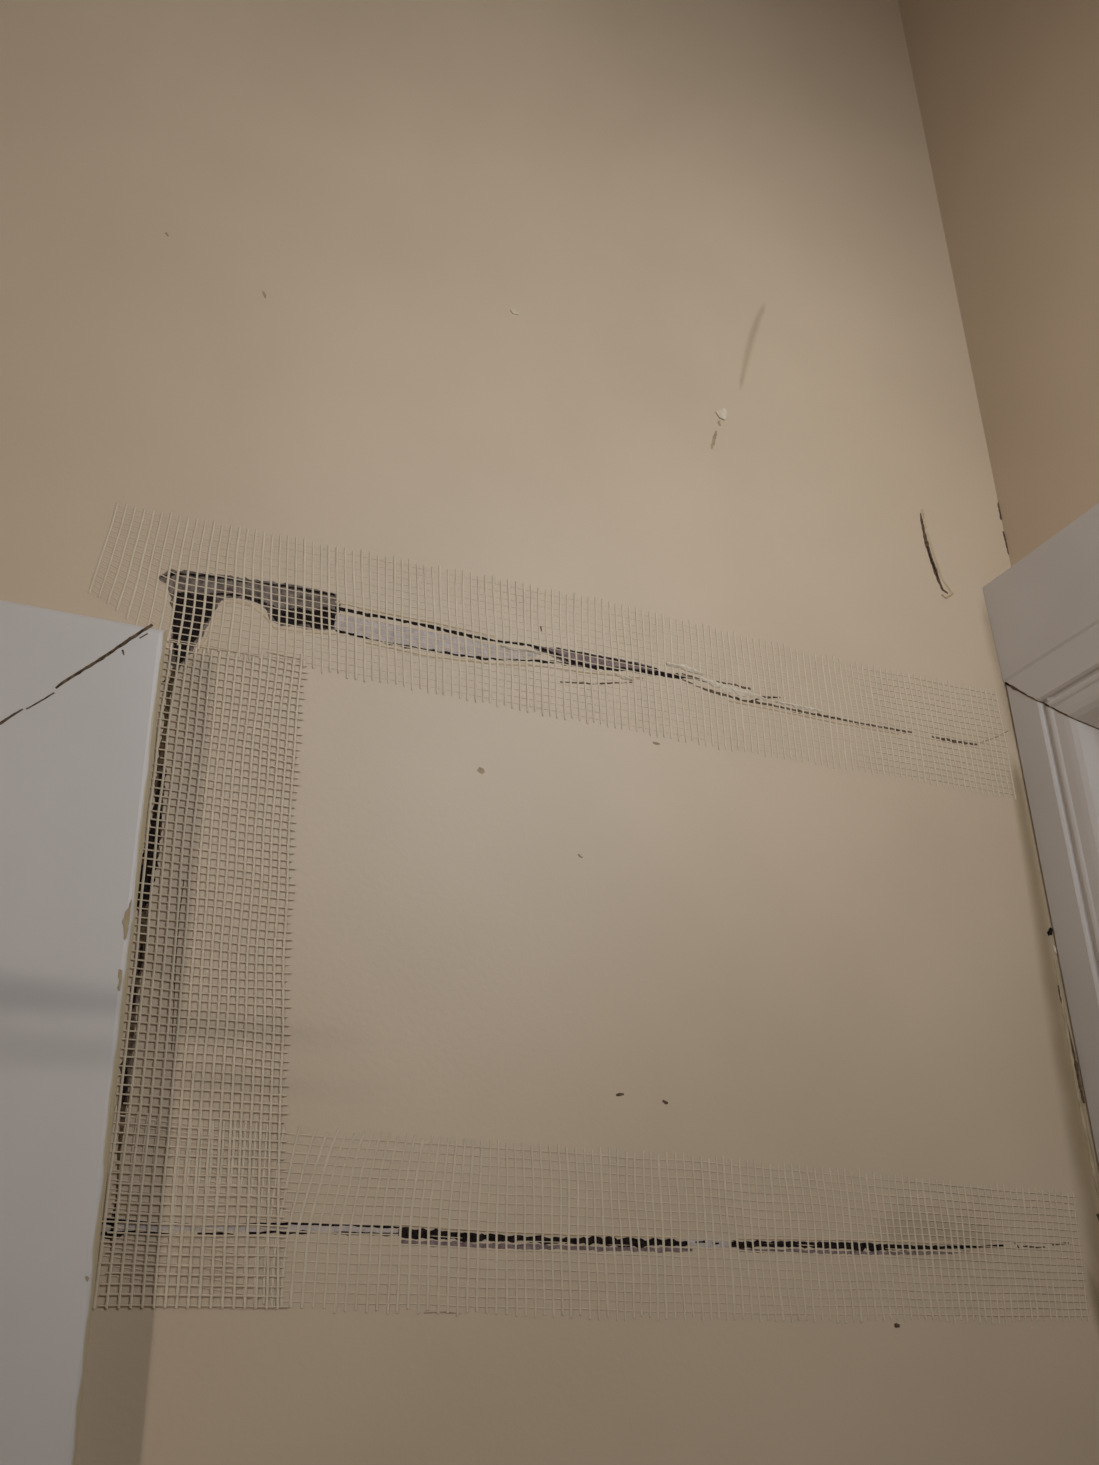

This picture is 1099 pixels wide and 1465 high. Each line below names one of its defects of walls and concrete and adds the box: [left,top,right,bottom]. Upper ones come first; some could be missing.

crack [920,513,948,594]
crack [334,601,1009,745]
crack [1005,682,1099,730]
crack [101,668,1069,1278]
crack [1054,960,1099,1220]